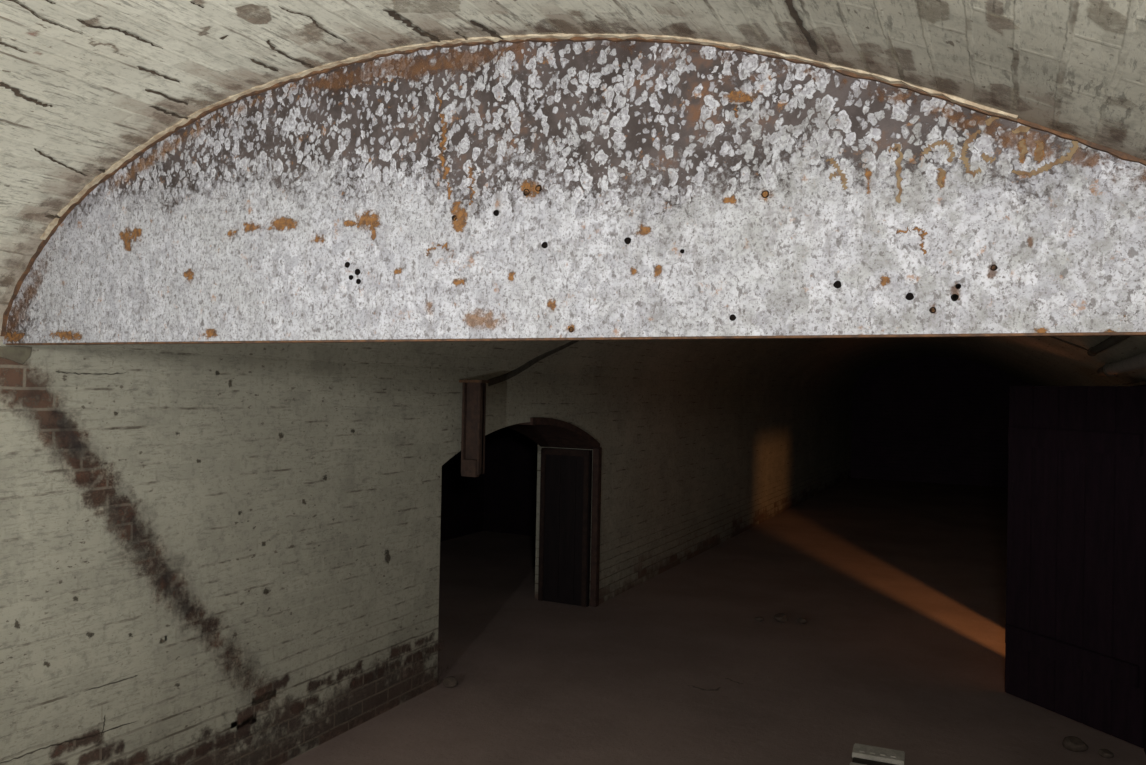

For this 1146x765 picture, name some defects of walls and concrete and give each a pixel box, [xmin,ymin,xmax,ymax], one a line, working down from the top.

crack [279,6,346,42]
crack [785,0,817,55]
crack [8,0,188,119]
crack [251,40,312,71]
crack [0,82,53,107]
crack [34,149,105,176]
corrosion [0,37,1146,342]
peeling [0,346,444,765]